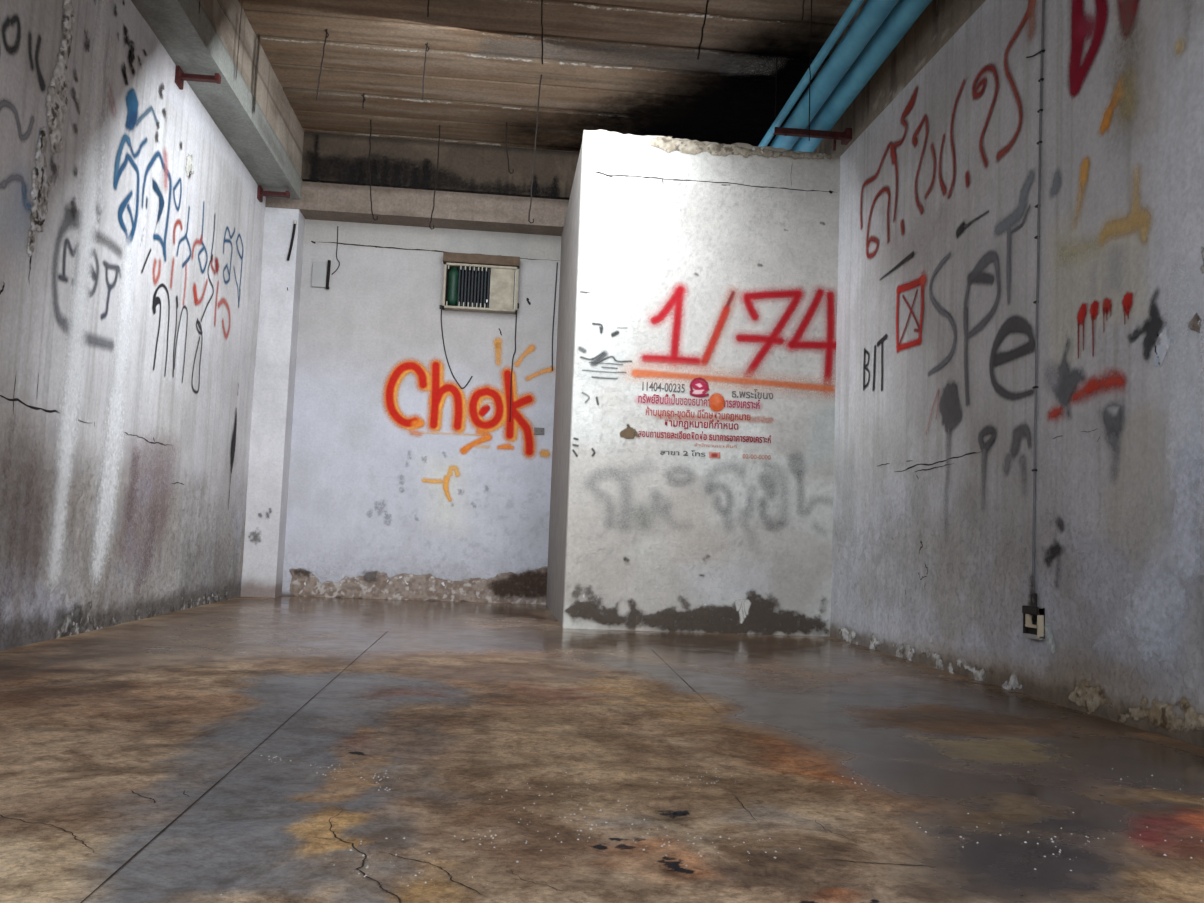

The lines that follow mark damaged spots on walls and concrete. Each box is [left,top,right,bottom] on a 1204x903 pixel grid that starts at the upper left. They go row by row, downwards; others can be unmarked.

damp [468,33,773,73]
peeling [27,0,75,279]
crack [0,373,168,445]
spalling [289,567,547,604]
spalling [55,589,228,639]
spalling [1068,680,1204,733]
crack [314,808,482,903]